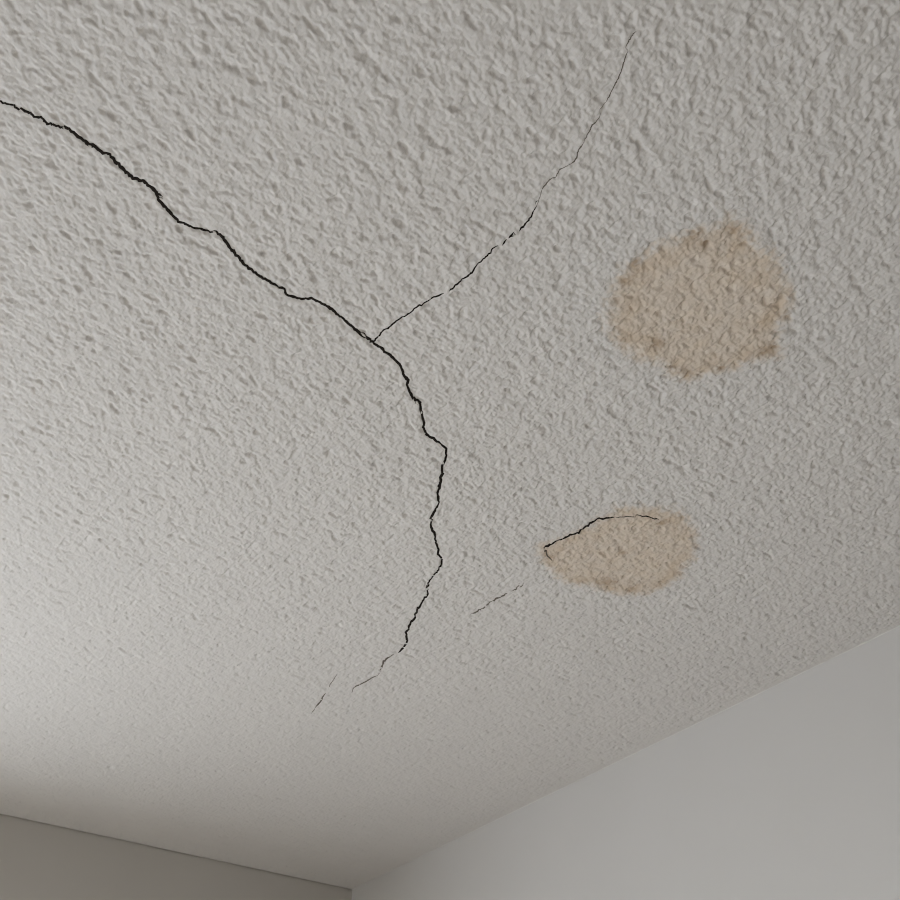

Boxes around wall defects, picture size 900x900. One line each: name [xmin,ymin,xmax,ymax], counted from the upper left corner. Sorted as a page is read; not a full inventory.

crack [0,32,635,714]
leakage [591,207,802,388]
crack [544,515,657,561]
leakage [529,499,708,600]